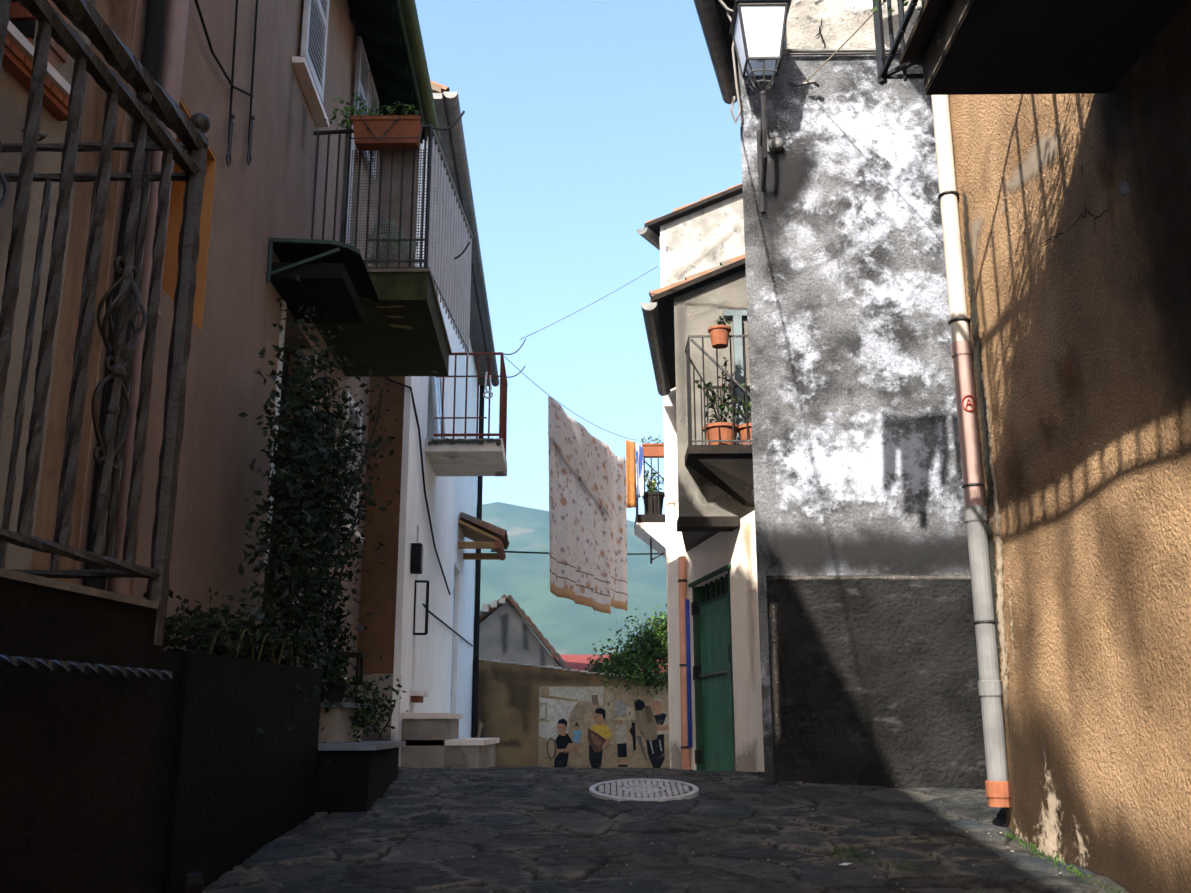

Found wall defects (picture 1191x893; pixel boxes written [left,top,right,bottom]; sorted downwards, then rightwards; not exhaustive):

leakage [764,155,811,243]
crack [1039,198,1115,245]
leakage [767,528,969,572]
flaking render [1016,767,1062,861]
flaking render [1076,825,1088,866]